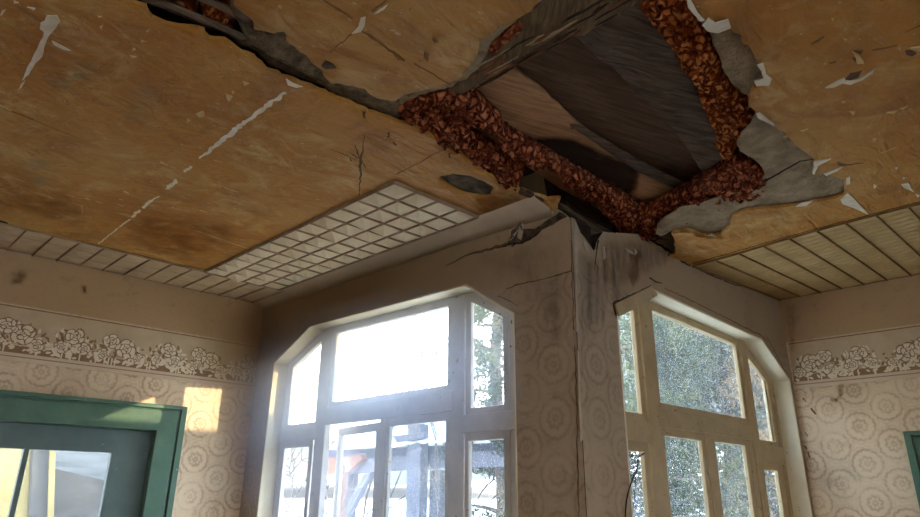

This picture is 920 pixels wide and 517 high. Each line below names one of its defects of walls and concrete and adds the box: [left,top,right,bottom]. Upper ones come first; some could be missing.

peeling [18,15,71,90]
crack [151,0,401,195]
peeling [330,0,517,104]
peeling [687,0,772,97]
peeling [825,51,876,89]
peeling [98,92,287,270]
flaking render [441,174,493,194]
peeling [656,112,868,237]
crack [445,230,541,266]